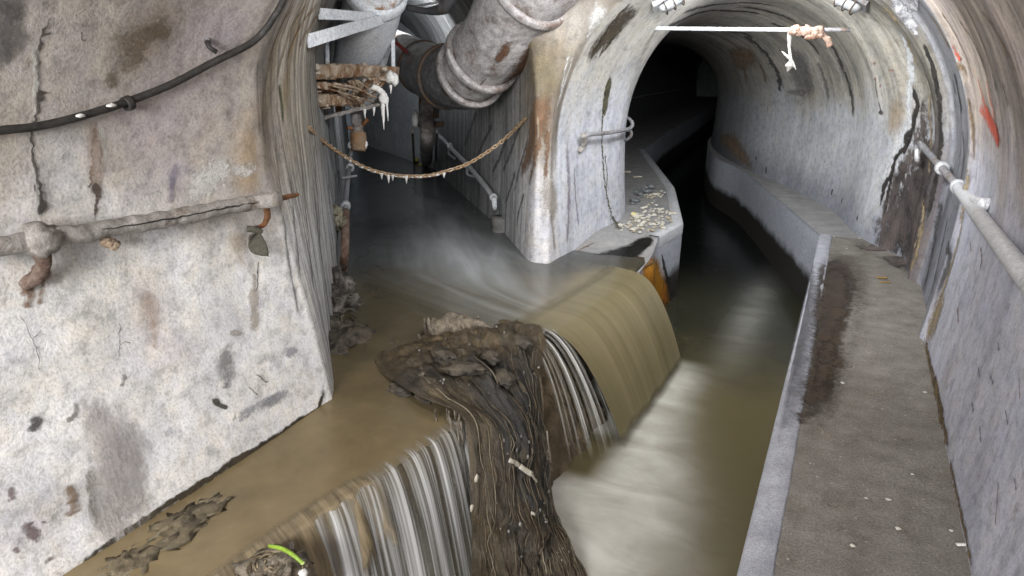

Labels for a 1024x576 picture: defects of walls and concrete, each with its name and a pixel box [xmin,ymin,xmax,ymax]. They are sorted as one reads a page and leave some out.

water stain [587,5,636,58]
crack [30,19,51,215]
corrosion [521,93,551,184]
water stain [879,34,944,187]
corrosion [643,258,669,305]
water stain [923,172,952,291]